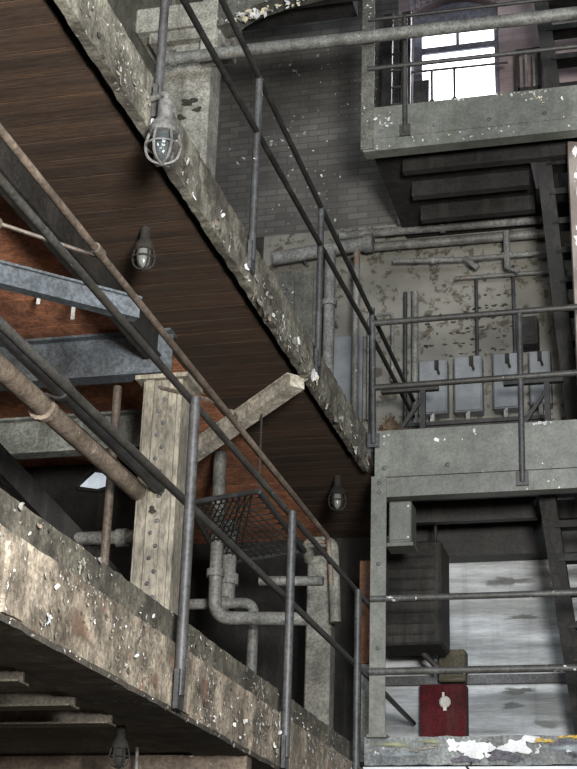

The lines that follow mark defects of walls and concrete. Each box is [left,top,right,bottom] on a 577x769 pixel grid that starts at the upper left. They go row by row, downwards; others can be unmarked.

peeling [234,0,304,23]
spalling [446,735,577,763]